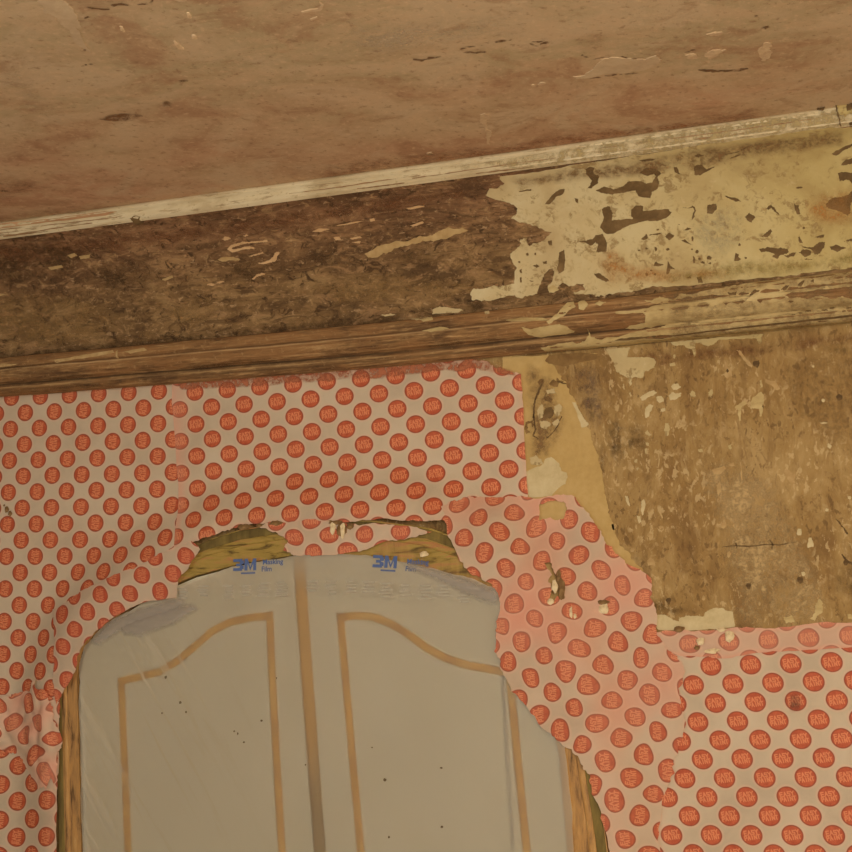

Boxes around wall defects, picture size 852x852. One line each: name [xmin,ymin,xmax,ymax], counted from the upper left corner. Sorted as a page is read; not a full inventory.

peeling [470,127,852,572]
peeling [545,562,565,601]
peeling [656,608,735,631]